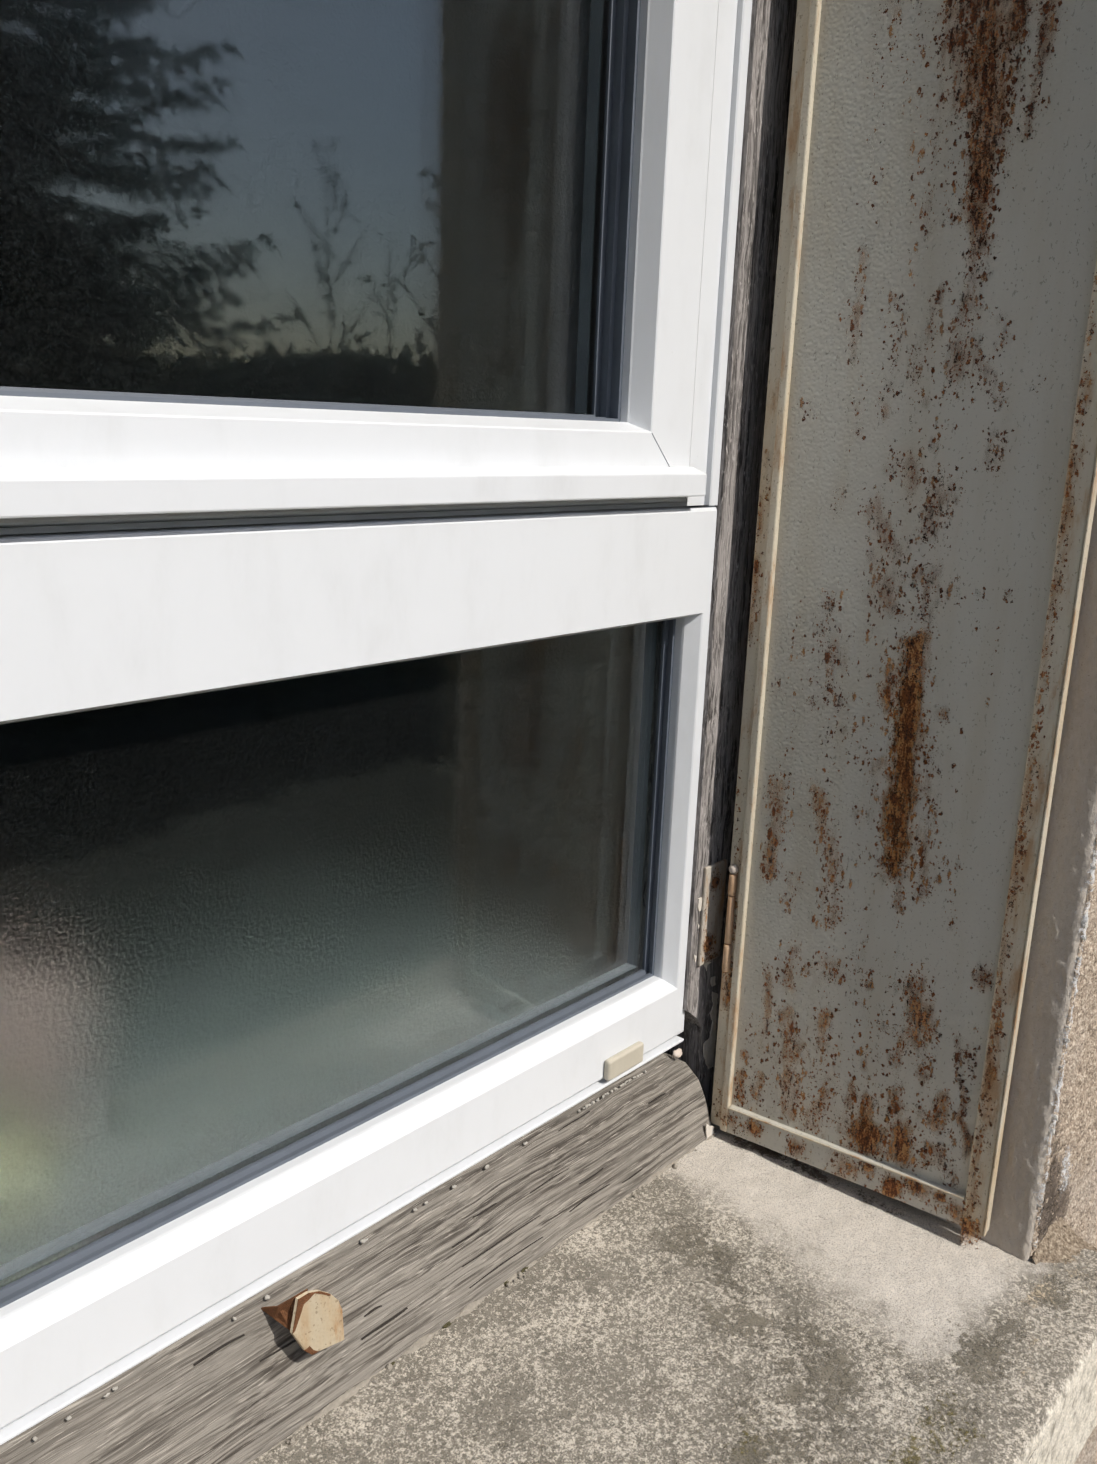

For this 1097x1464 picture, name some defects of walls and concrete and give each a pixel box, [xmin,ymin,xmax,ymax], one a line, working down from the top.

corrosion [702,770,744,1011]
corrosion [713,0,1097,1249]